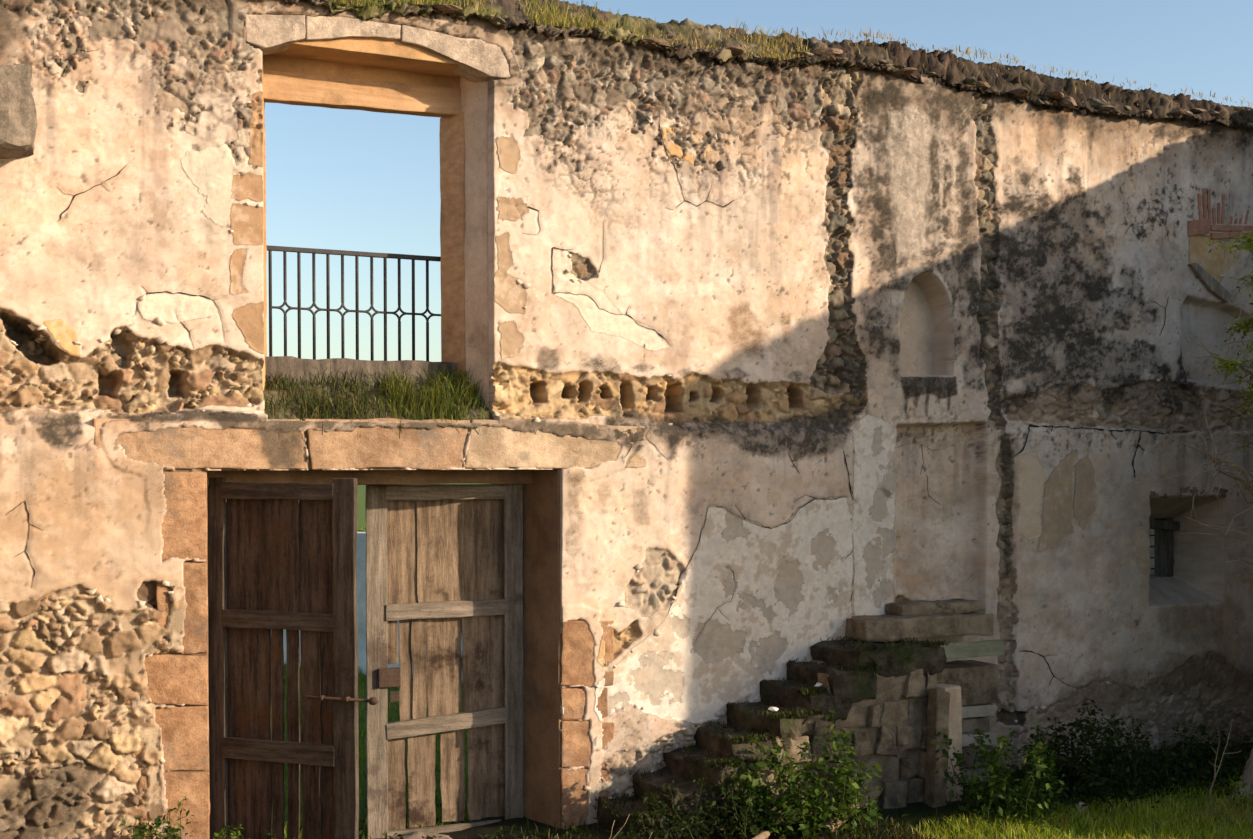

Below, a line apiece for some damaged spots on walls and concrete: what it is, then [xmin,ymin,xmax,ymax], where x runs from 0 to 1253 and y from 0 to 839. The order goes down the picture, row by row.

crack [59,168,124,221]
spalling [0,0,264,415]
crack [521,206,671,346]
leakage [850,76,1197,416]
leakage [1124,184,1214,241]
leakage [1129,120,1253,147]
peeling [491,27,918,824]
spalling [971,89,1253,770]
crack [10,502,43,585]
crack [667,451,856,616]
spalling [0,580,188,839]